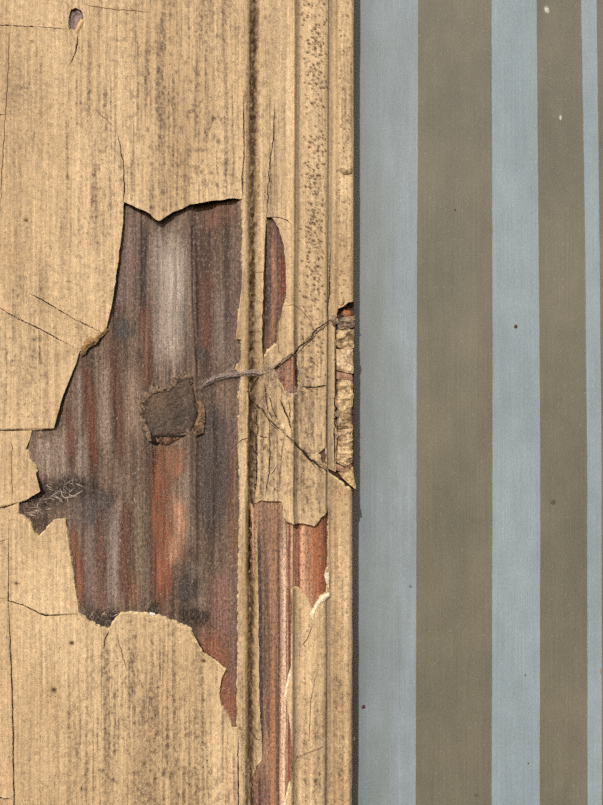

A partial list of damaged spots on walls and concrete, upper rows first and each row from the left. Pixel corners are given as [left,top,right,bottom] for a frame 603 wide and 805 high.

peeling [69,8,83,34]
crack [0,24,78,207]
crack [96,110,125,199]
crack [0,429,27,509]
crack [0,308,79,350]
crack [29,293,102,333]
peeling [19,198,330,805]
crack [238,105,337,496]
peeling [332,310,356,489]
crack [0,527,68,805]